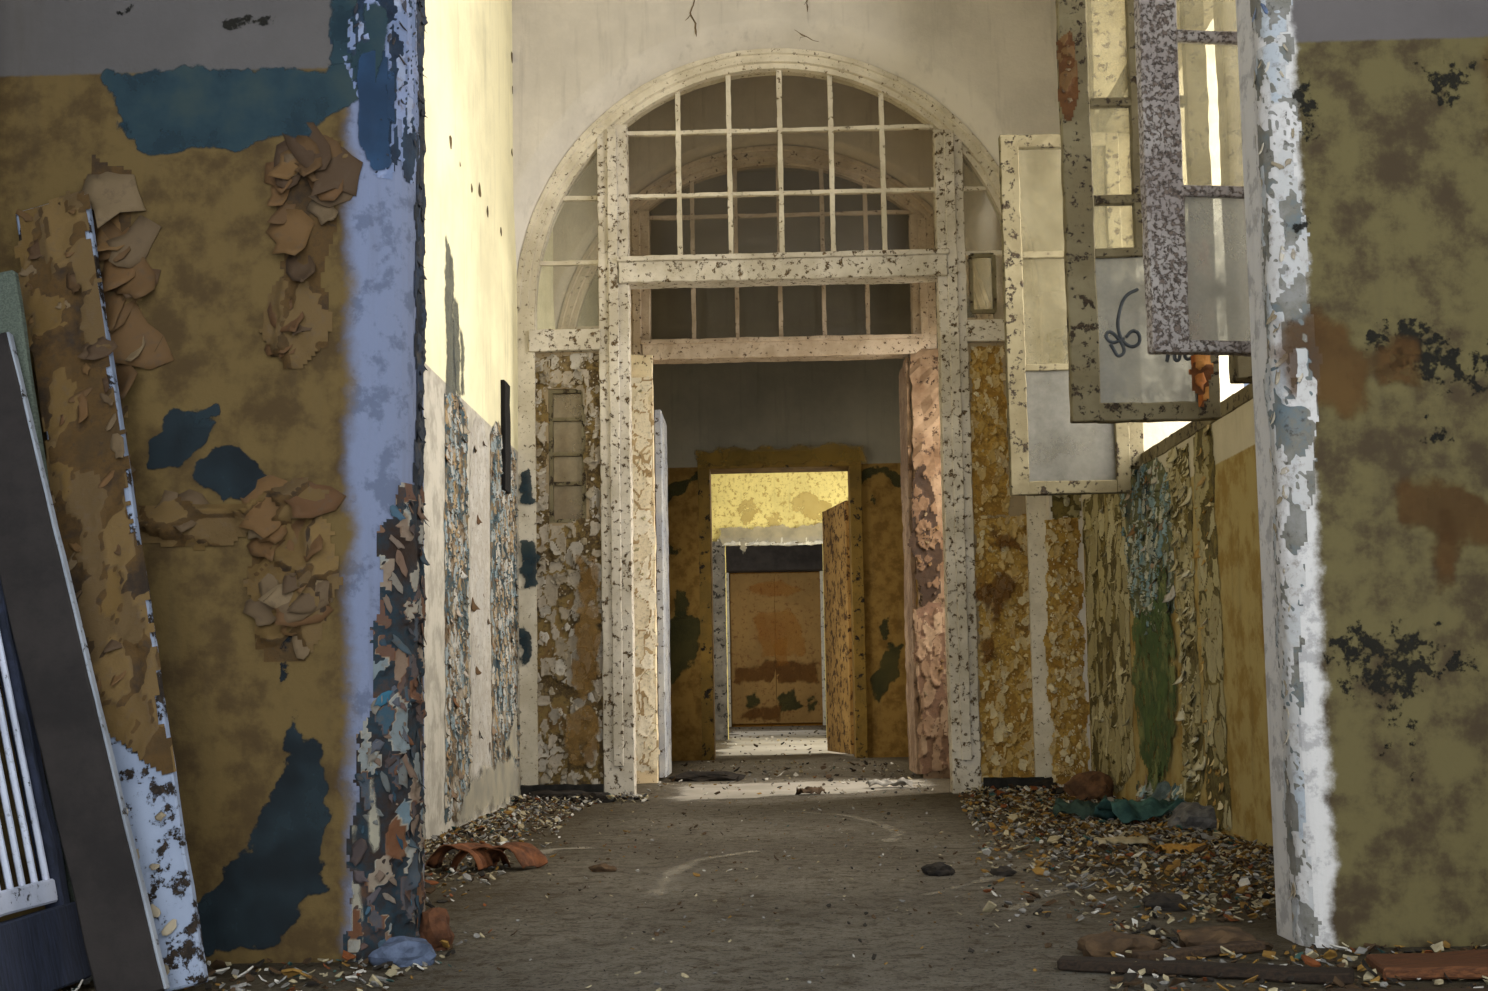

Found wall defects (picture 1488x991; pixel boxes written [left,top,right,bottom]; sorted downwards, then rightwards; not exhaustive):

crack [685,0,697,37]
peeling [1056,31,1080,121]
peeling [1046,325,1069,364]
peeling [259,0,604,962]
peeling [1250,0,1322,947]
peeling [969,345,1232,832]
peeling [912,592,950,774]